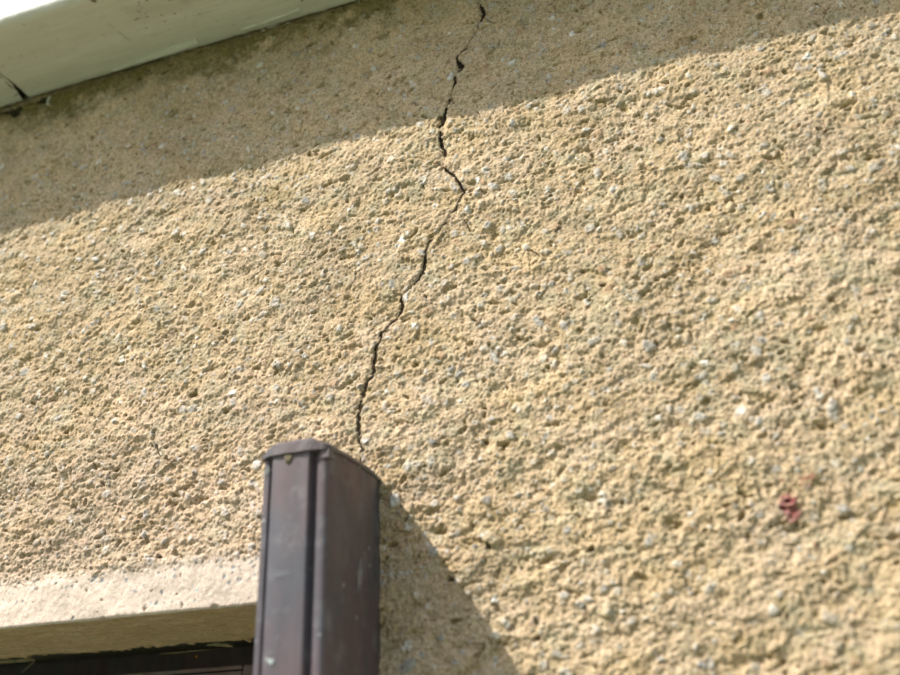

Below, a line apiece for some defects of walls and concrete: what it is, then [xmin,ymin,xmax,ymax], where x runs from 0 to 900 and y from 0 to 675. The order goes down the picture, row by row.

crack [0,64,27,112]
crack [357,3,493,462]